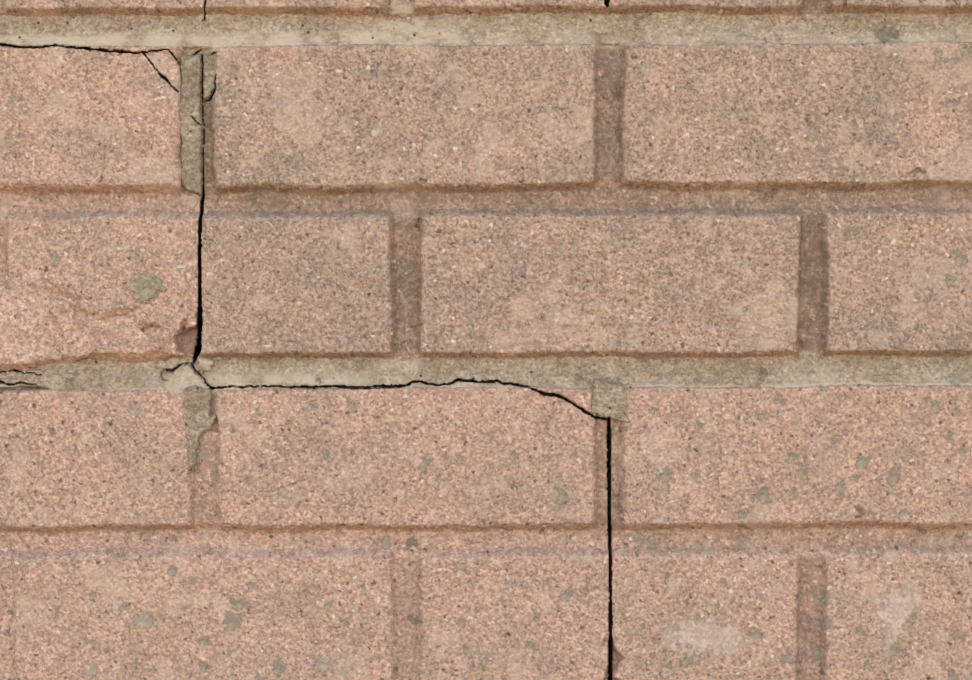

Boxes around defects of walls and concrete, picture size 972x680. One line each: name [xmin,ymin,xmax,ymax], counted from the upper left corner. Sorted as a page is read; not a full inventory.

spalling [0,279,199,374]
crack [0,43,612,680]